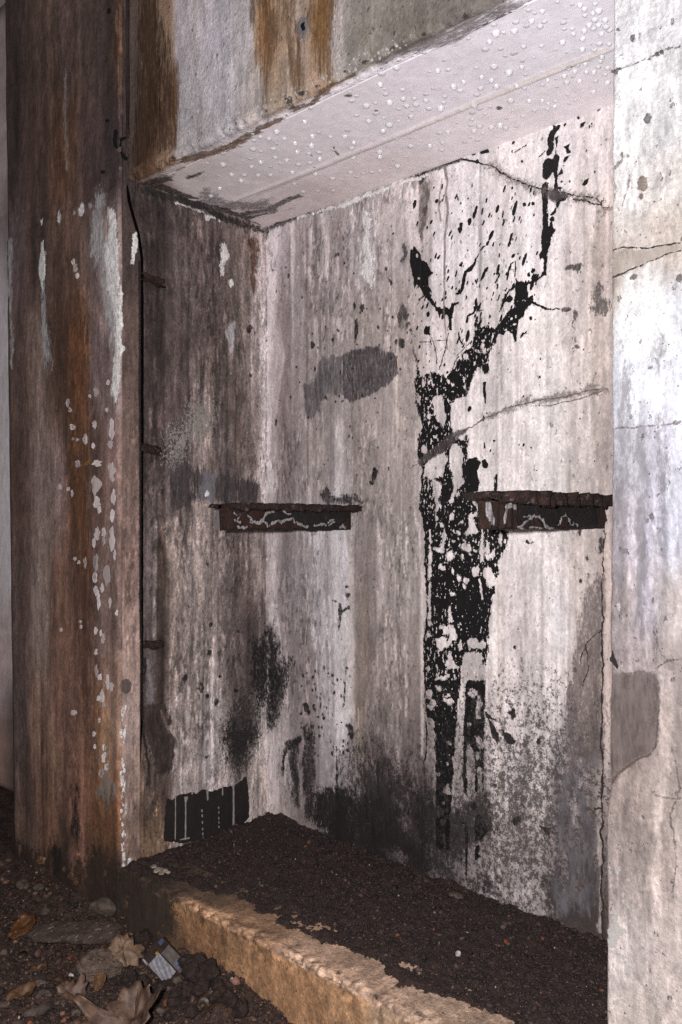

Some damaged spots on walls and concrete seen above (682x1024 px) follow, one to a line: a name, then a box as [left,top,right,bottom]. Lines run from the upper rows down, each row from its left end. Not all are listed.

corrosion [130,0,181,189]
corrosion [250,0,336,100]
leakage [375,0,530,65]
crack [460,158,612,216]
leakage [526,125,566,284]
crack [610,242,681,278]
crack [413,385,608,466]
peeling [66,399,118,615]
leakage [335,585,351,629]
peeling [79,620,114,778]
leakage [197,622,353,822]
crack [580,526,608,940]